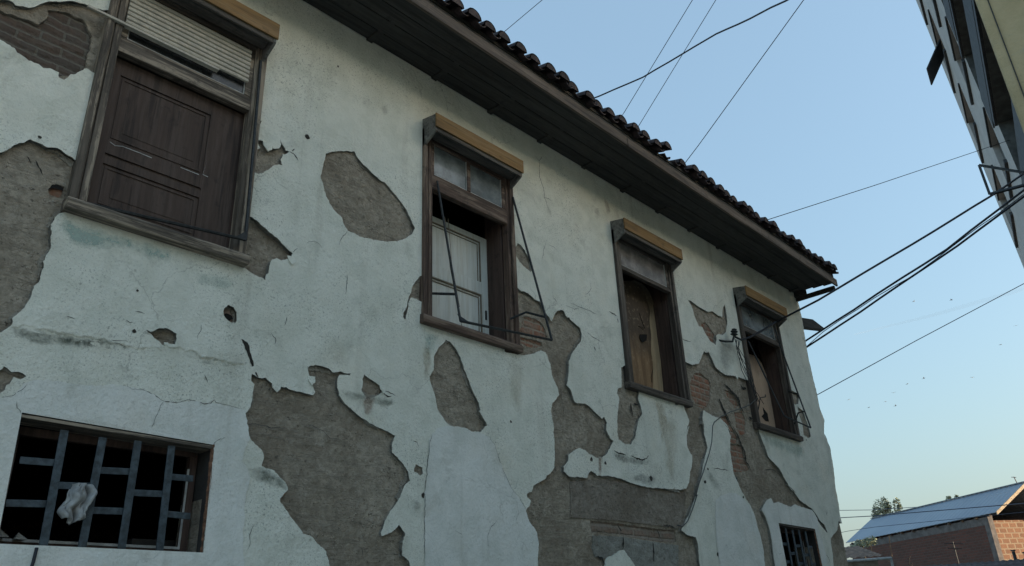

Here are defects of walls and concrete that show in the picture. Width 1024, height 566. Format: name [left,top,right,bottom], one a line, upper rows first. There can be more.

spalling [0,0,107,80]
spalling [0,136,75,332]
spalling [244,217,295,280]
spalling [255,140,289,174]
spalling [321,151,415,242]
spalling [132,328,177,345]
spalling [223,305,237,323]
spalling [0,367,26,393]
spalling [429,340,487,432]
spalling [246,365,423,566]
spalling [506,289,848,566]